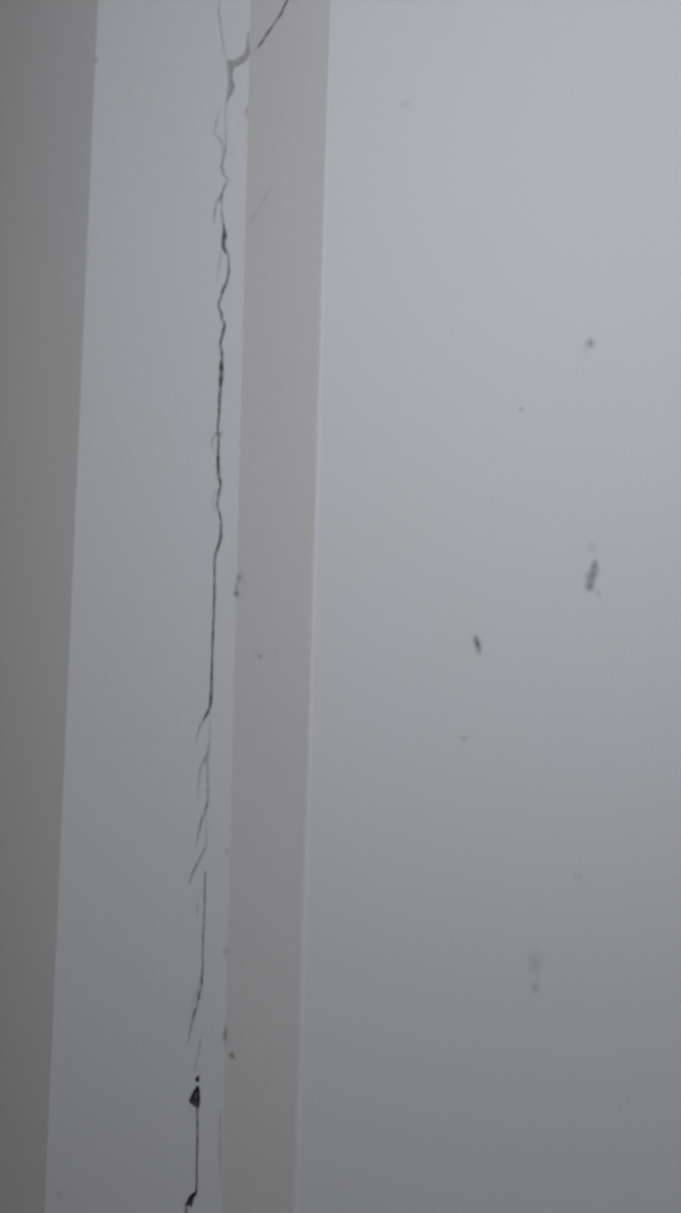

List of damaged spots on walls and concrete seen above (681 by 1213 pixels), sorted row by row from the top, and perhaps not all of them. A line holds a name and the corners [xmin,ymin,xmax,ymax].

crack [204,225,229,718]
crack [185,1108,198,1213]